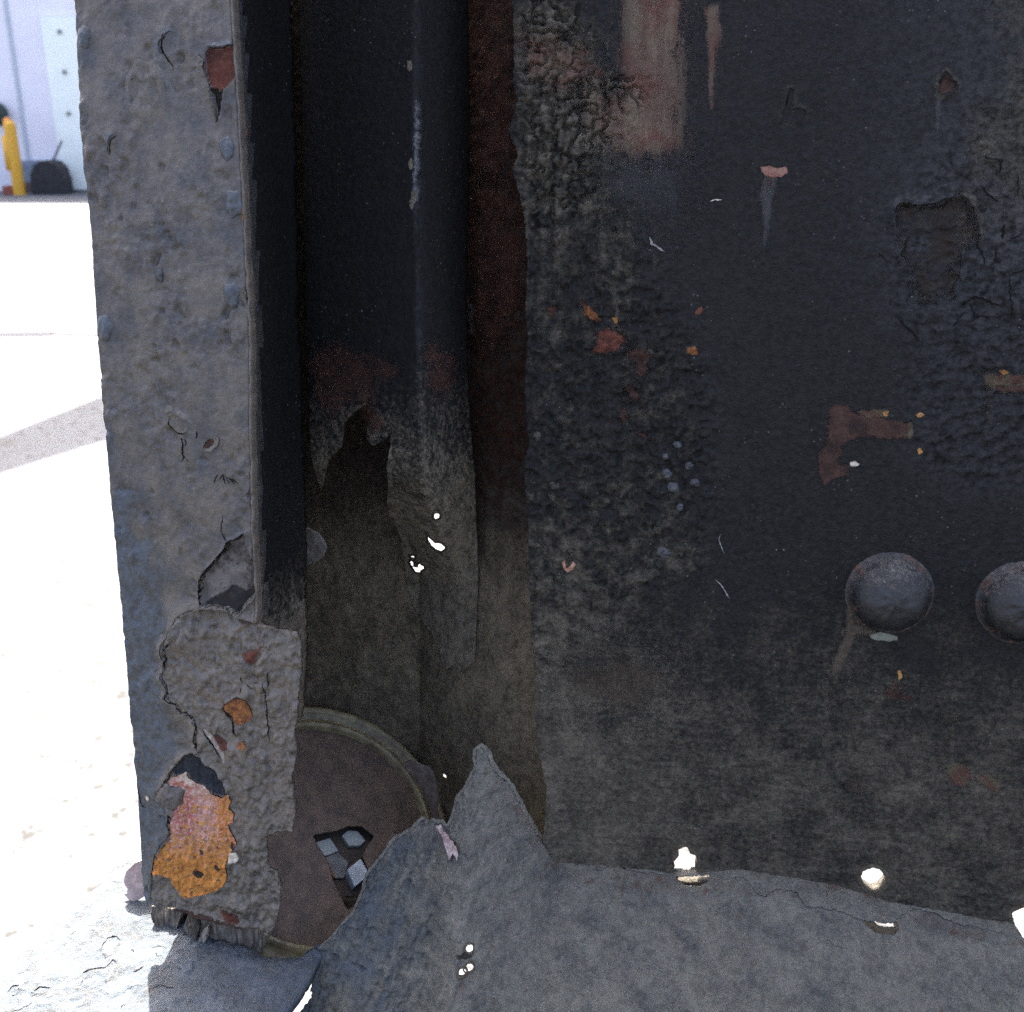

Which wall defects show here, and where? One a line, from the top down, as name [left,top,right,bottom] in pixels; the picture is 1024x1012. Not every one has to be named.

crack [153,26,176,66]
rust [580,302,650,401]
crack [165,405,198,461]
rust [818,404,913,486]
spalling [164,517,264,647]
crack [138,627,199,831]
spalling [173,729,227,795]
rust [151,772,243,929]